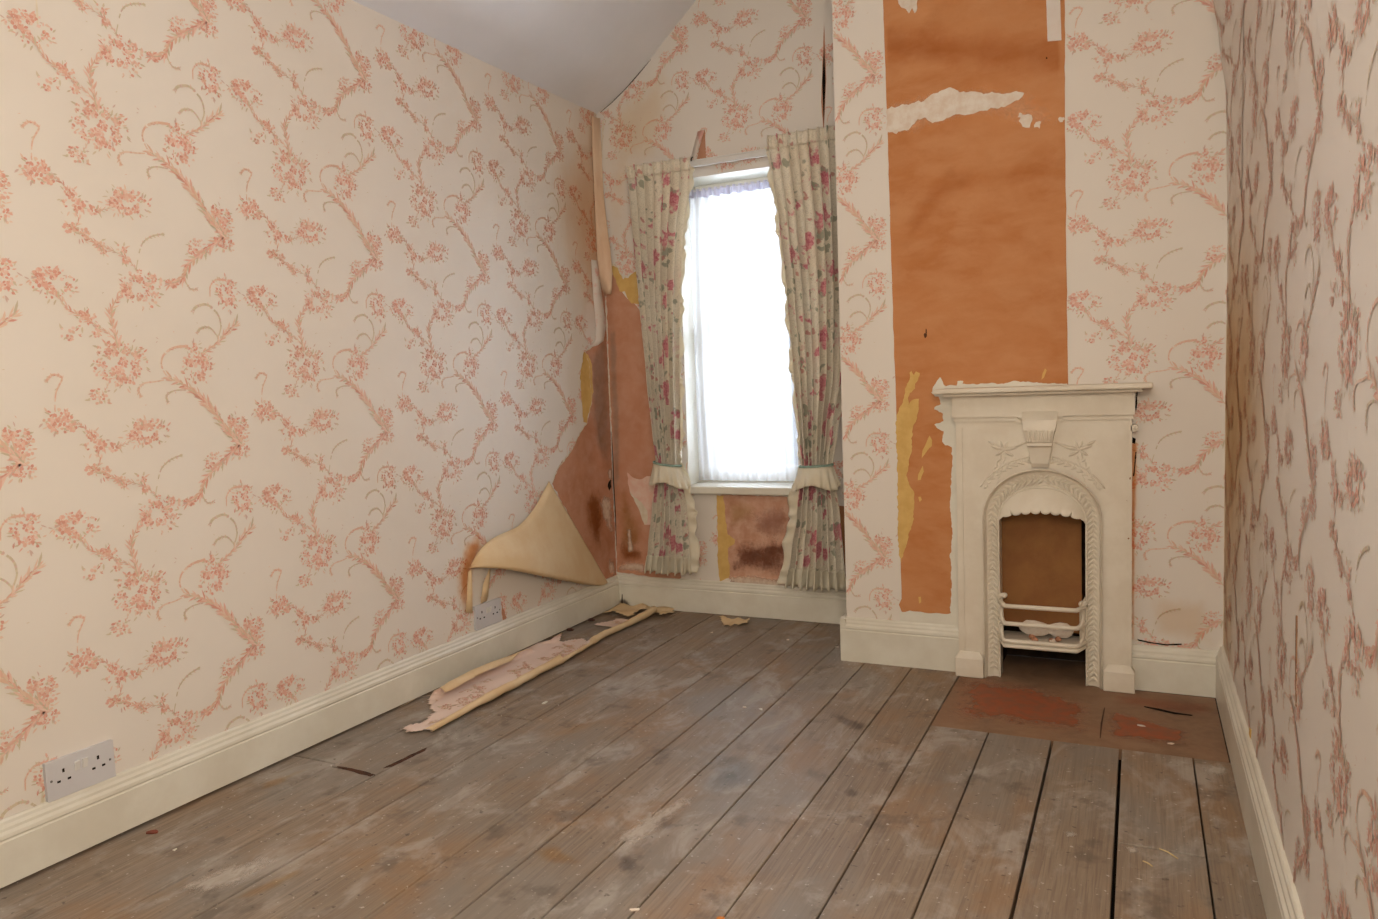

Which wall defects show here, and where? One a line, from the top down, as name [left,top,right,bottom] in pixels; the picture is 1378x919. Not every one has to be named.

flaking render [466,116,681,613]
flaking render [721,494,806,587]
flaking render [883,0,1068,614]